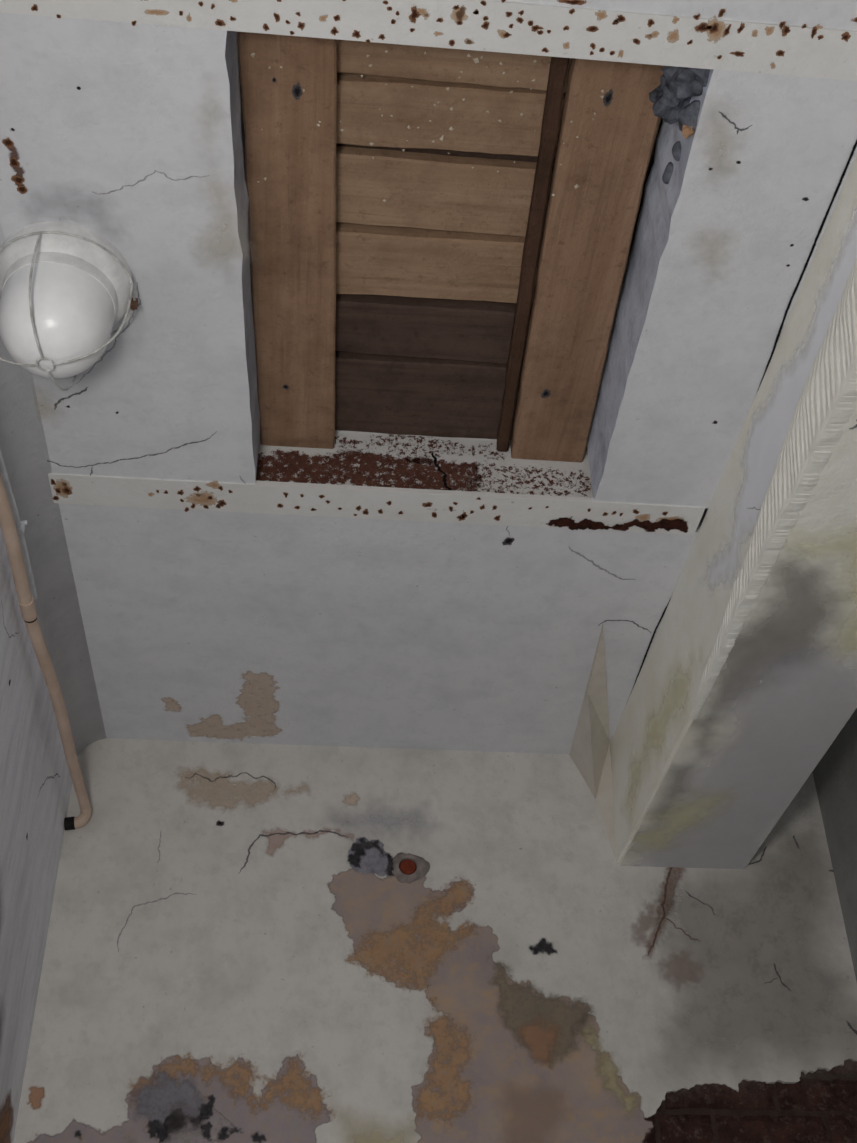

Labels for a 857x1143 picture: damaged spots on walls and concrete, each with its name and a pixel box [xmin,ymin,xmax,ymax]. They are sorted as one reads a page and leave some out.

rust [132,0,236,26]
rust [352,0,823,59]
rust [2,138,27,194]
damp [707,213,857,585]
crack [47,431,217,476]
rust [148,481,233,512]
rust [256,434,688,533]
peeling [187,671,282,741]
damp [638,567,857,869]
peeling [327,837,857,1143]
peeling [0,1094,13,1143]
peeling [28,1054,332,1143]